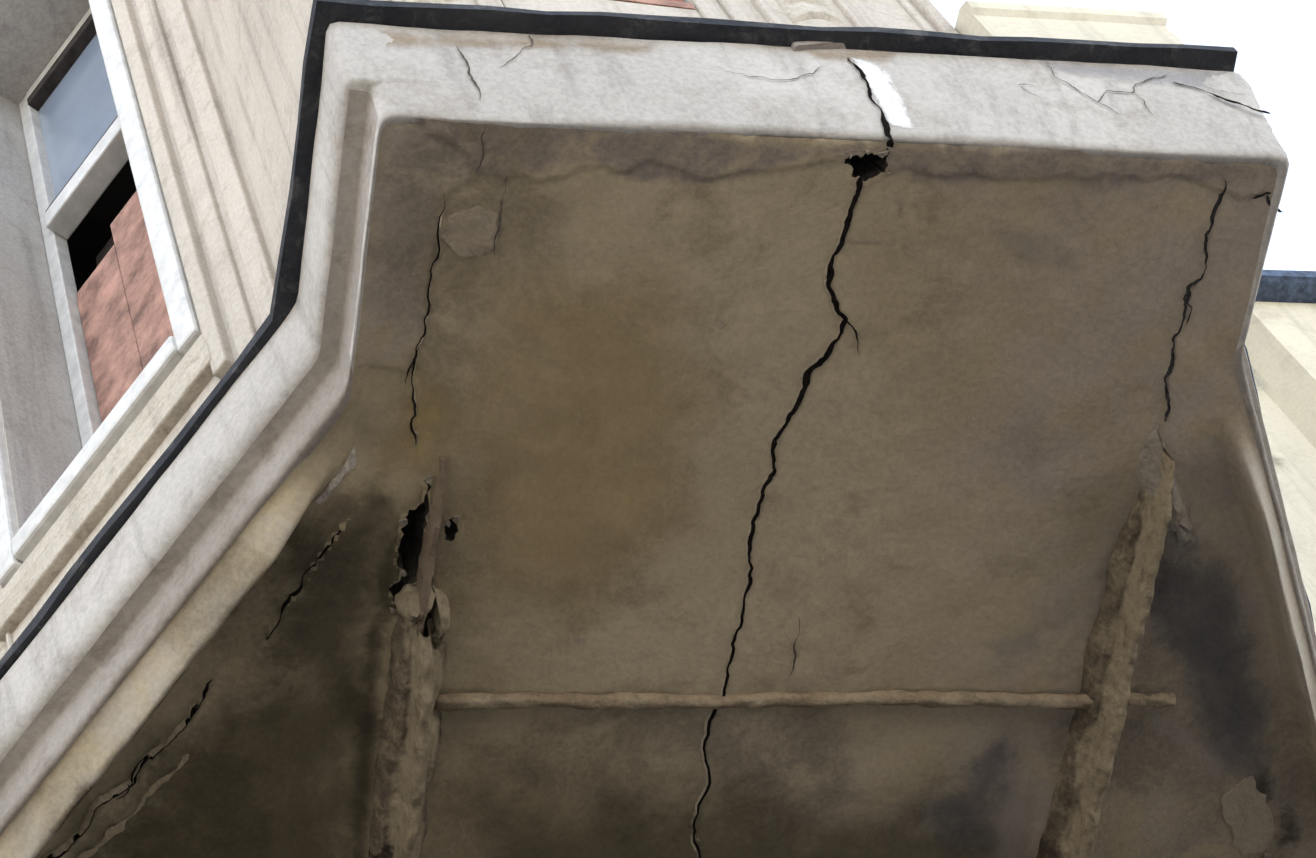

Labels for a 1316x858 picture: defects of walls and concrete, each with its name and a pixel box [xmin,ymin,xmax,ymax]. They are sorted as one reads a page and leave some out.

crack [457,35,534,255]
crack [1019,64,1270,114]
crack [405,192,446,446]
crack [1164,180,1282,422]
crack [691,57,894,858]
water stain [59,787,93,829]
crack [44,679,212,858]
water stain [115,501,382,858]
crack [266,530,341,640]
spalling [388,474,465,649]
water stain [1155,569,1252,756]
peeling [1220,775,1275,857]